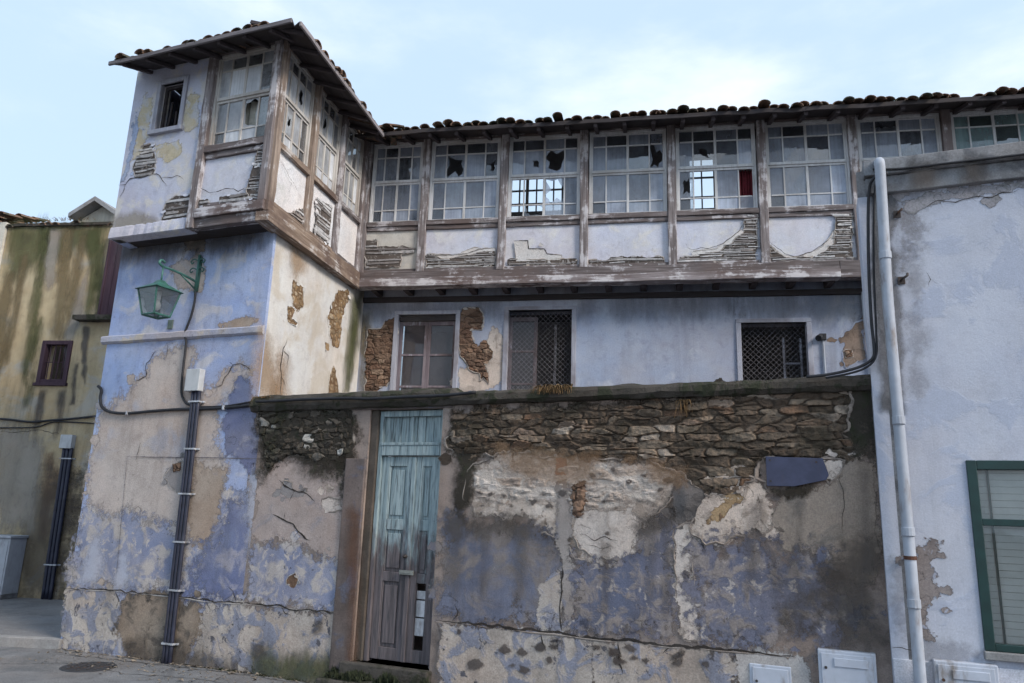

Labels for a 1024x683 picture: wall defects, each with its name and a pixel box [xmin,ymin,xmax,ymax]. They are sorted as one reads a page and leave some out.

peeling [426,241,664,267]
peeling [680,213,855,263]
crack [928,190,1017,206]
leakage [0,213,156,432]
peeling [450,326,503,392]
leakage [0,392,82,599]
leakage [79,534,104,583]
leakage [114,553,128,588]
crack [65,446,333,615]
peeling [60,343,345,676]
crack [436,568,795,673]
peeling [427,449,953,683]